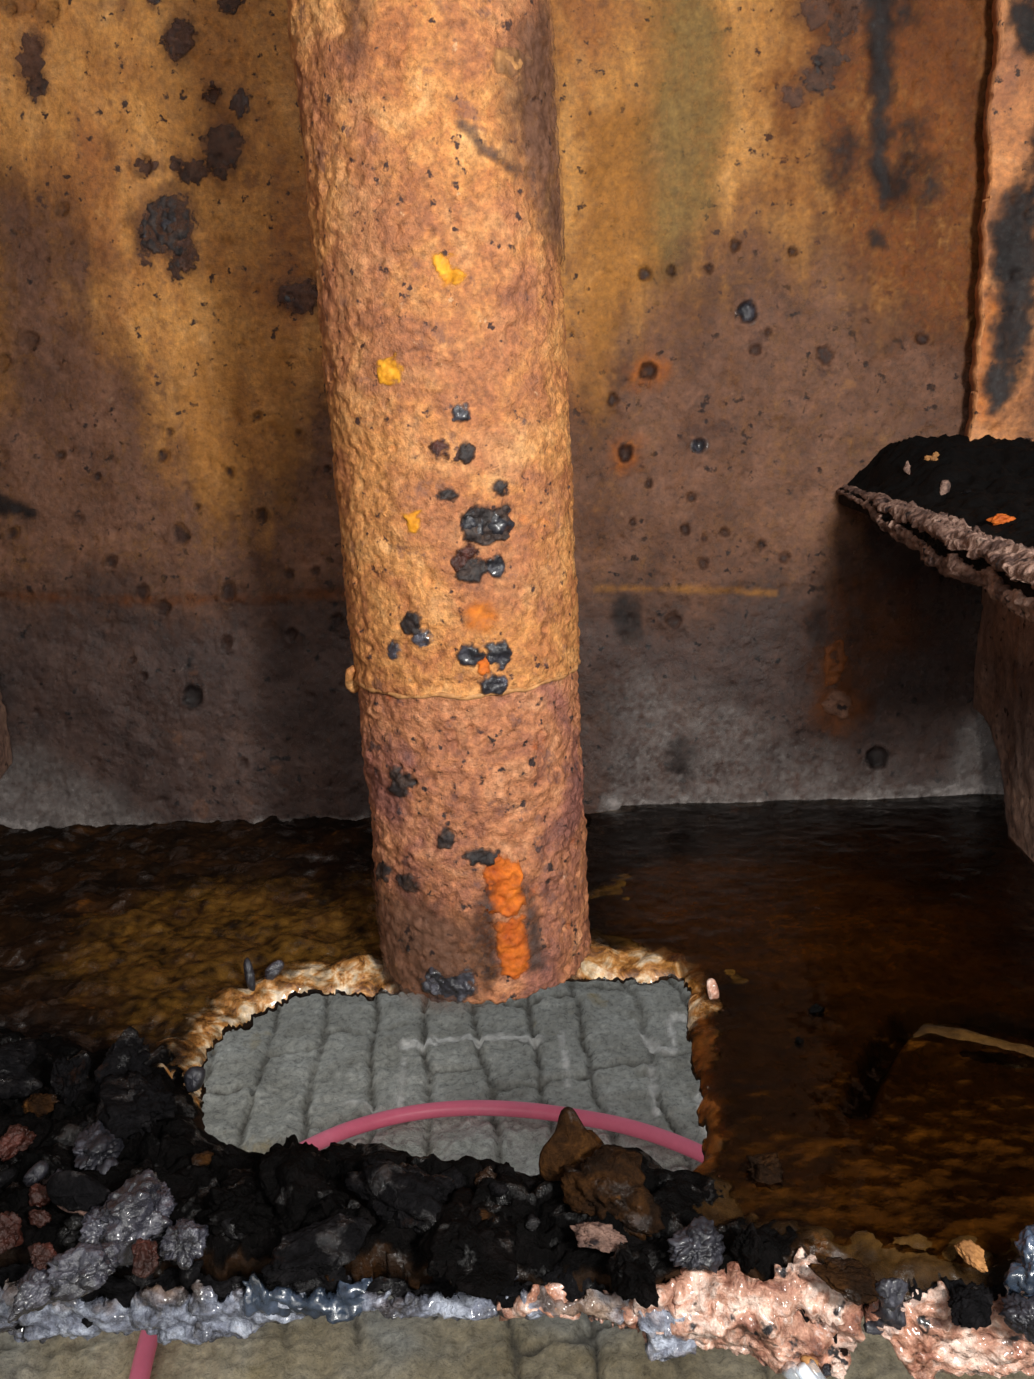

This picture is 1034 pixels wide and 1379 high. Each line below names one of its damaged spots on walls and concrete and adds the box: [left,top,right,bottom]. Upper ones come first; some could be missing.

water stain [510,1,565,251]
corrosion [377,354,402,385]
corrosion [428,439,476,465]
corrosion [452,403,471,422]
water stain [569,0,1034,814]
corrosion [438,479,515,583]
corrosion [387,611,432,660]
corrosion [456,603,512,695]
corrosion [388,766,418,797]
corrosion [437,828,500,867]
water stain [523,889,545,971]
water stain [613,818,1034,1264]